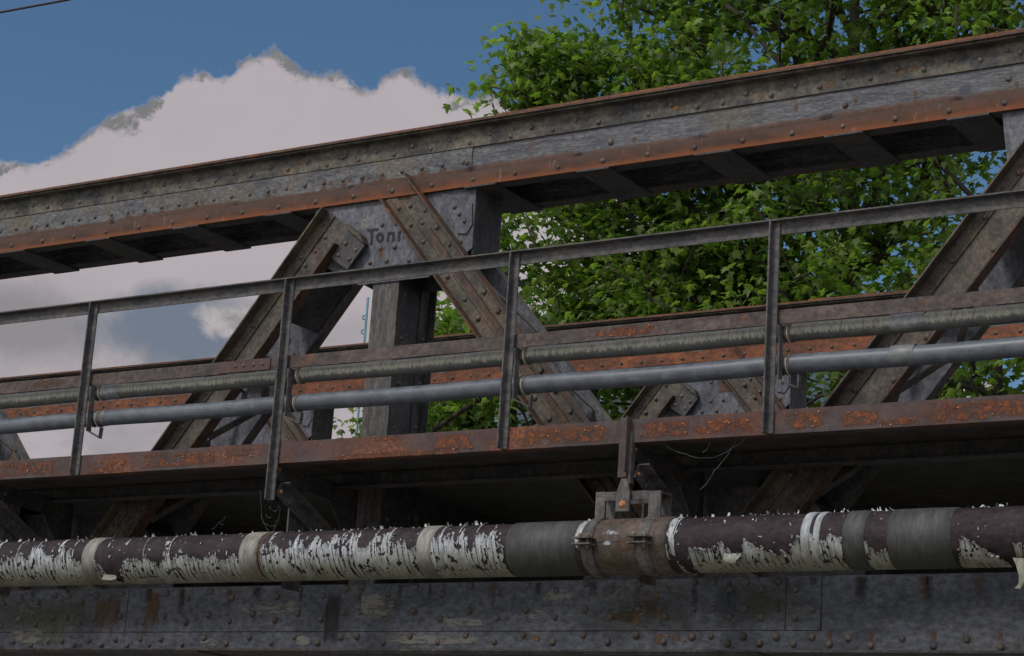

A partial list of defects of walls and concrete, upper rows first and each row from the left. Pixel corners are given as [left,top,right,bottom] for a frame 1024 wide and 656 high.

corrosion [0,82,1024,252]
peeling [0,532,251,587]
peeling [260,521,517,581]
peeling [666,510,852,574]
peeling [863,541,898,570]
peeling [957,525,1024,568]